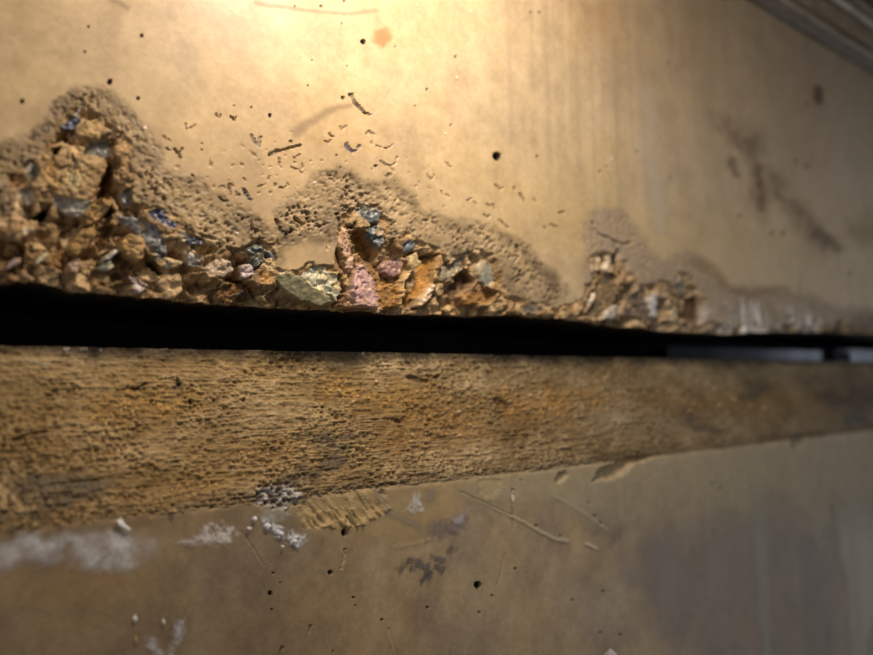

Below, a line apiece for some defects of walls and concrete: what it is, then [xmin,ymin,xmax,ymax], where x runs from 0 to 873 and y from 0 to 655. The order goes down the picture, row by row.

spalling [347,92,372,117]
spalling [0,103,873,336]
leakage [183,526,234,543]
leakage [247,516,305,548]
leakage [0,536,55,565]
leakage [75,535,137,565]
leakage [839,518,873,655]